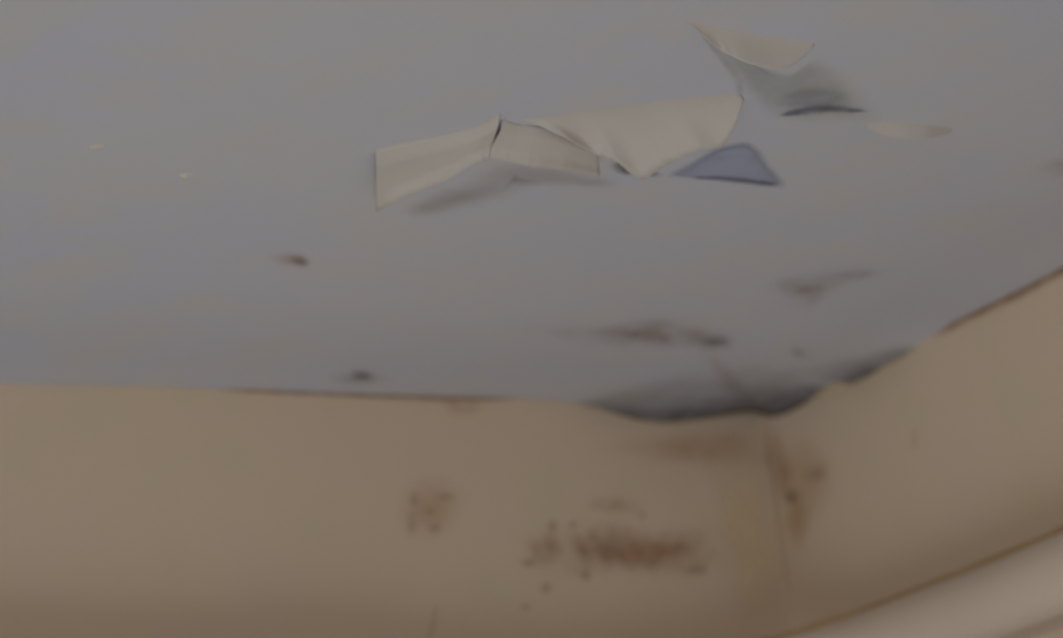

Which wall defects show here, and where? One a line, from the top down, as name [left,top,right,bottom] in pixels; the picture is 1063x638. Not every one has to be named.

peeling [685,19,815,70]
peeling [375,94,777,212]